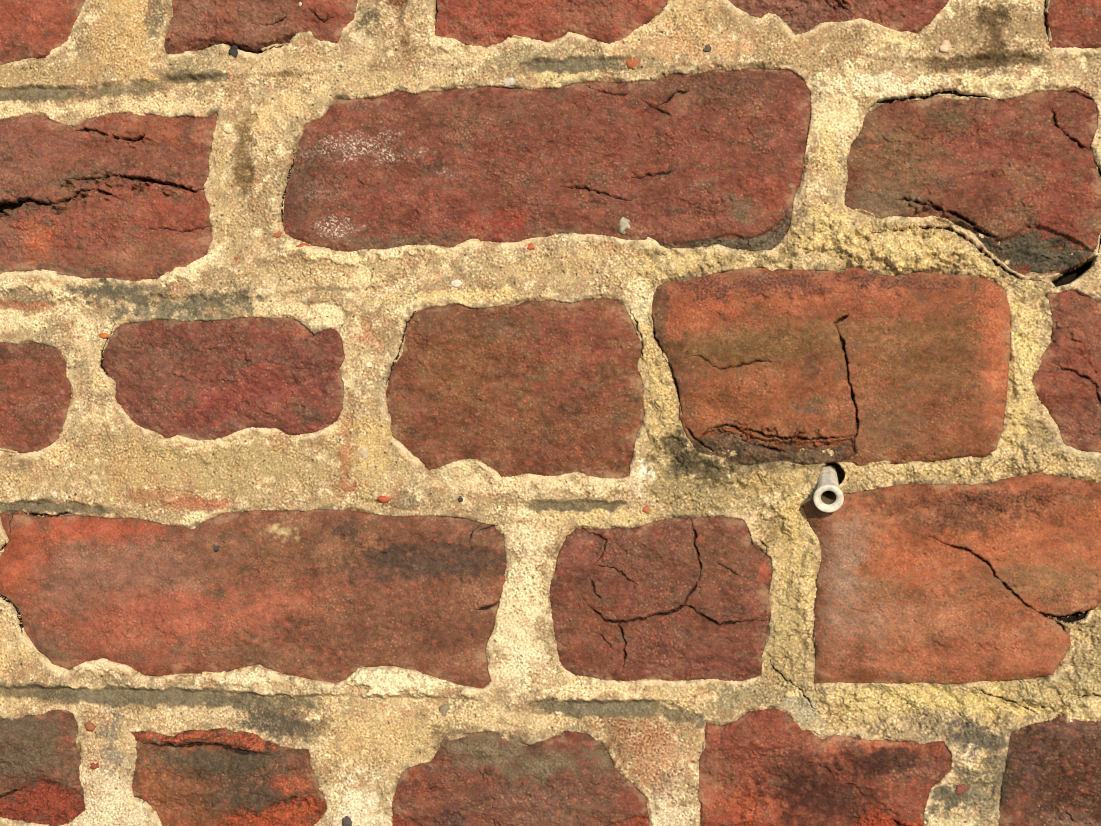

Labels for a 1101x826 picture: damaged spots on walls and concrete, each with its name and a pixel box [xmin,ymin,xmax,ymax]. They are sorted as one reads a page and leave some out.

crack [1052,91,1101,177]
crack [0,175,205,213]
crack [870,198,1045,283]
crack [630,309,859,452]
crack [580,520,767,673]
crack [929,536,1092,633]
spalling [131,729,277,751]
spalling [0,778,85,826]
spalling [217,788,326,826]
spalling [392,809,417,826]
spalling [613,814,649,826]
spalling [852,803,924,826]